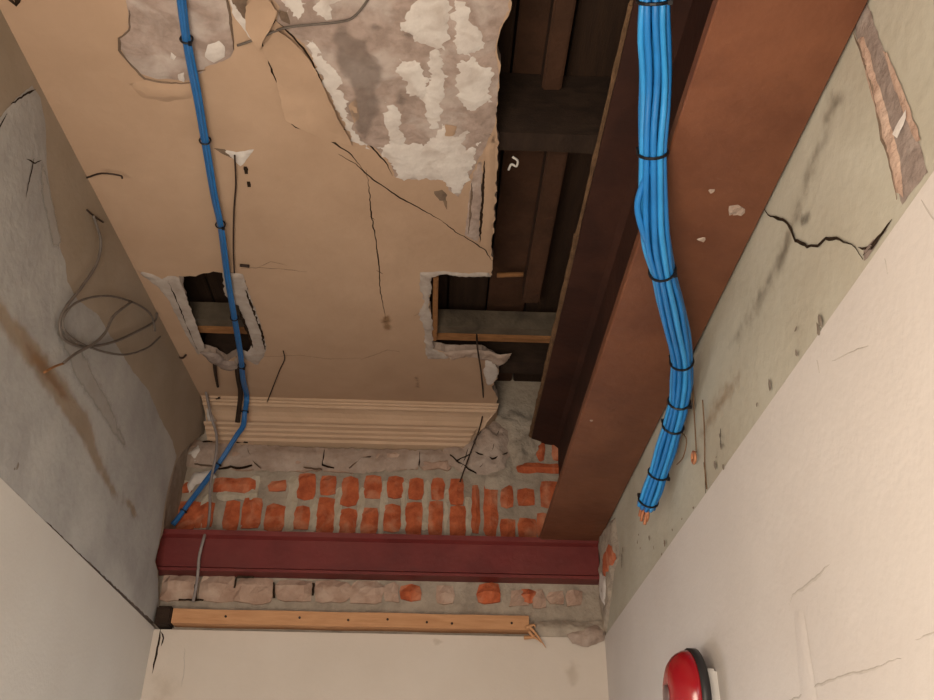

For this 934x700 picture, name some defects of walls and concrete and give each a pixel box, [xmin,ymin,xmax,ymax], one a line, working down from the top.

crack [273,19,322,81]
peeling [118,0,509,251]
crack [332,129,490,323]
crack [764,209,892,274]
peeling [0,86,176,622]
spalling [140,272,266,371]
spalling [418,271,512,386]
spalling [186,410,541,493]
spalling [534,518,623,647]
crack [789,564,830,605]
crack [790,658,901,700]